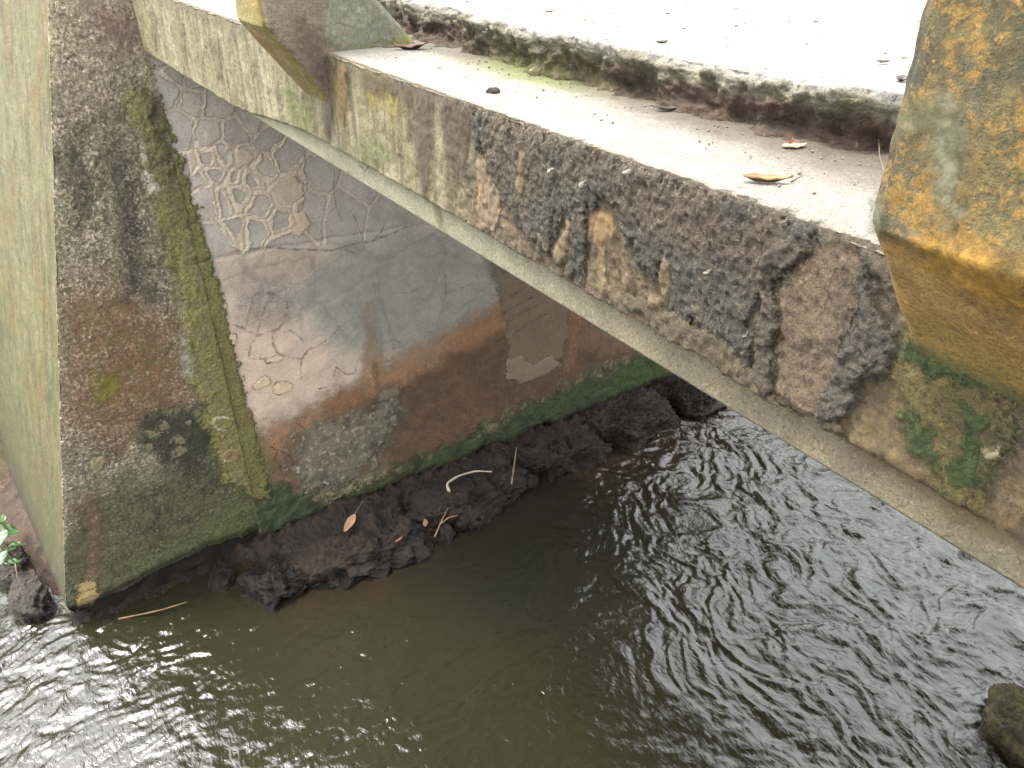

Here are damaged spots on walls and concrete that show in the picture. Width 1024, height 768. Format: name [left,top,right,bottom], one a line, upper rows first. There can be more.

damp [137,124,160,205]
peeling [474,150,502,231]
damp [139,403,212,471]
crack [236,292,358,389]
corrosion [256,301,508,466]
damp [310,336,646,505]
peeling [490,263,570,384]
corrosion [564,311,585,373]
spalling [773,242,866,416]